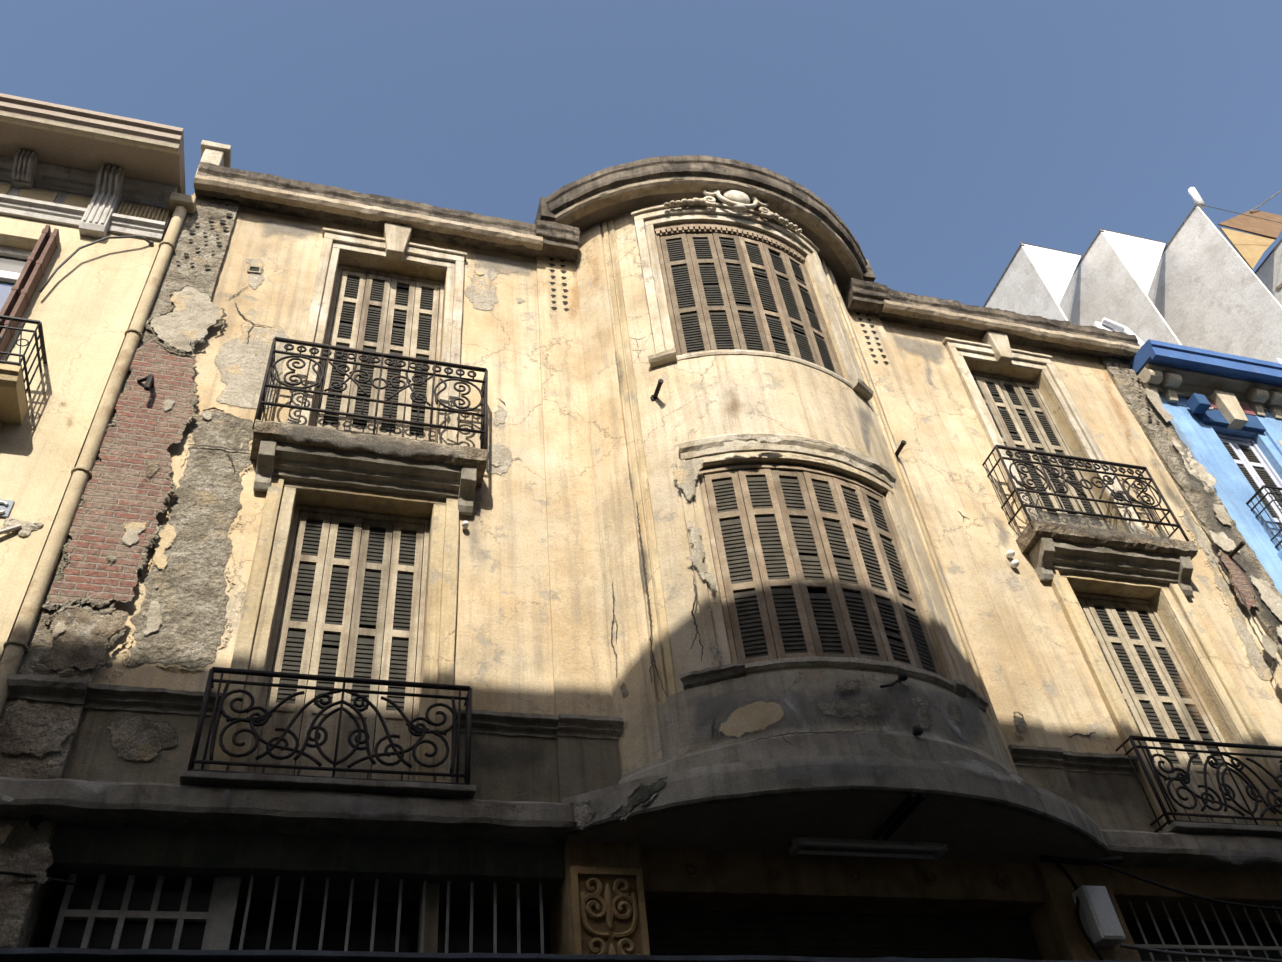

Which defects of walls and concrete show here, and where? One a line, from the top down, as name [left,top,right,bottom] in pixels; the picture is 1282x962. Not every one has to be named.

hole [246,259,265,289]
spalling [1145,388,1173,422]
flaking render [33,284,294,675]
crack [610,583,618,678]
crack [636,501,666,694]
crack [690,575,704,662]
peeling [1172,438,1282,688]
spalling [0,698,76,756]
spalling [106,715,178,762]
peeling [719,701,784,738]
spalling [569,776,668,831]
spalling [0,814,54,884]